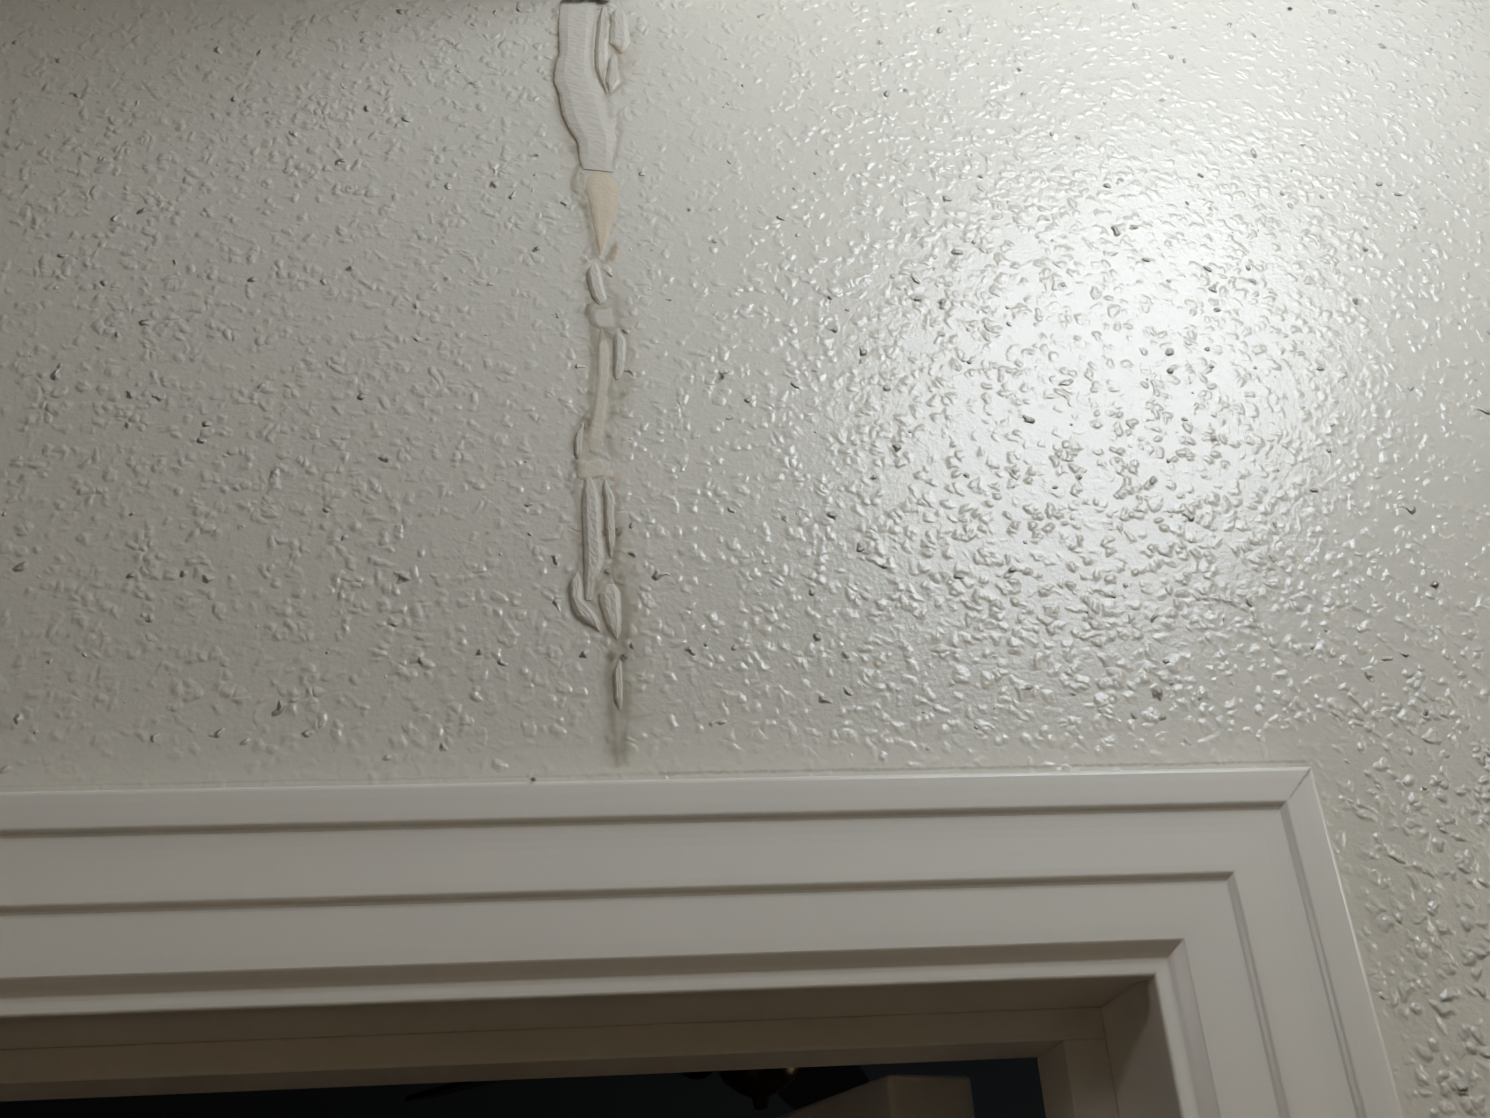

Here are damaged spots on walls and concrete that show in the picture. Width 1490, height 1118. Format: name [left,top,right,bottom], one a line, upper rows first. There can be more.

crack [563,0,609,8]
peeling [554,6,630,640]
peeling [614,658,623,709]